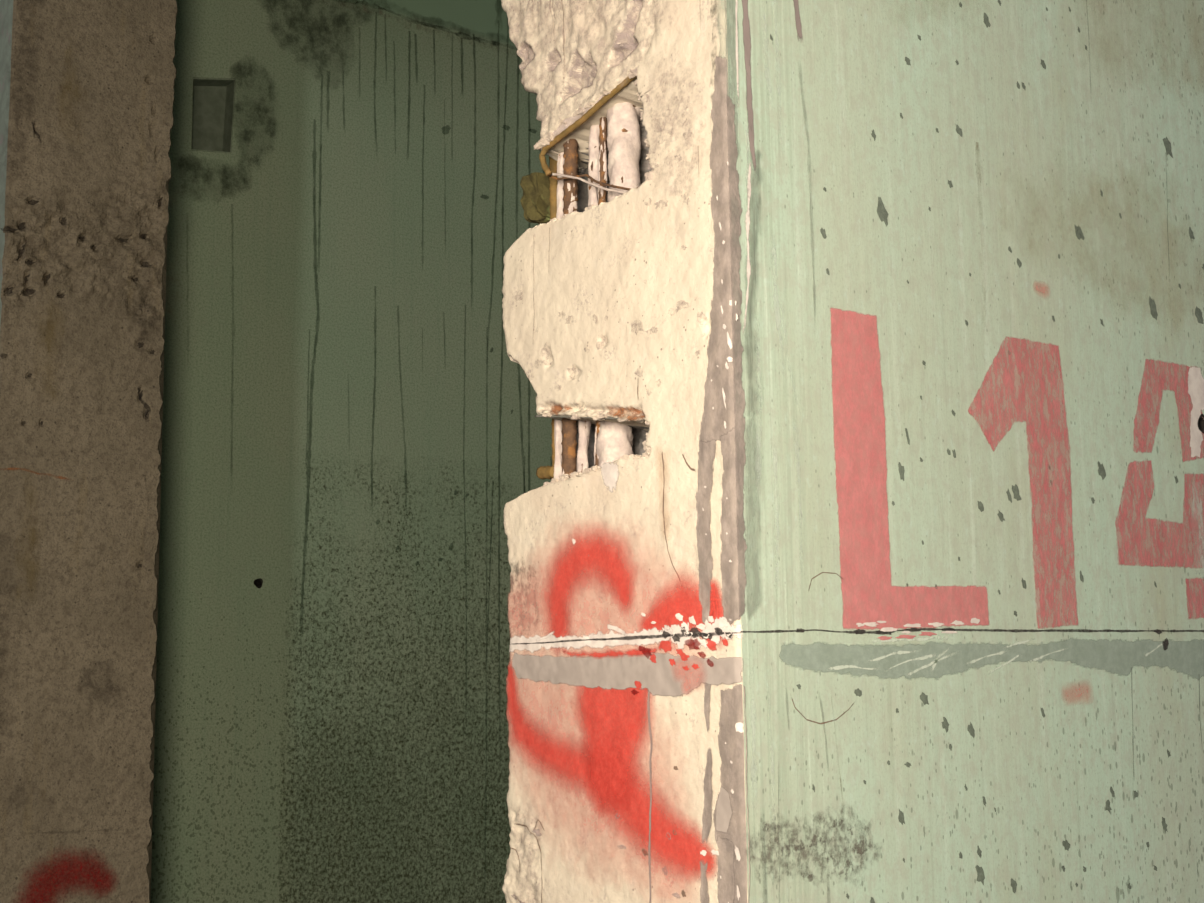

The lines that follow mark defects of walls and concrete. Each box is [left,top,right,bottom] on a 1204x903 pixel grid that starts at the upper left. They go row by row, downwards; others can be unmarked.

water stain [498,61,550,173]
spalling [529,50,612,150]
spalling [615,0,655,184]
water stain [492,178,517,276]
spalling [550,142,627,221]
water stain [519,379,530,491]
spalling [542,405,651,486]
crack [514,627,1204,650]